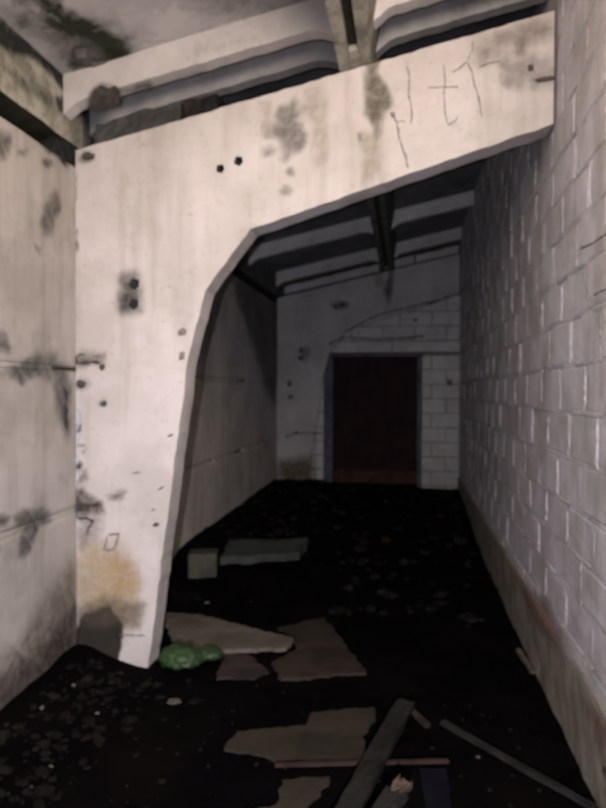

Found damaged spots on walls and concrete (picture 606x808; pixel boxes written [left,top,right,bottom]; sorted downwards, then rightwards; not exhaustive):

leakage [0,19,63,111]
leakage [36,0,131,70]
leakage [366,63,390,123]
leakage [13,361,38,382]
leakage [0,511,46,555]